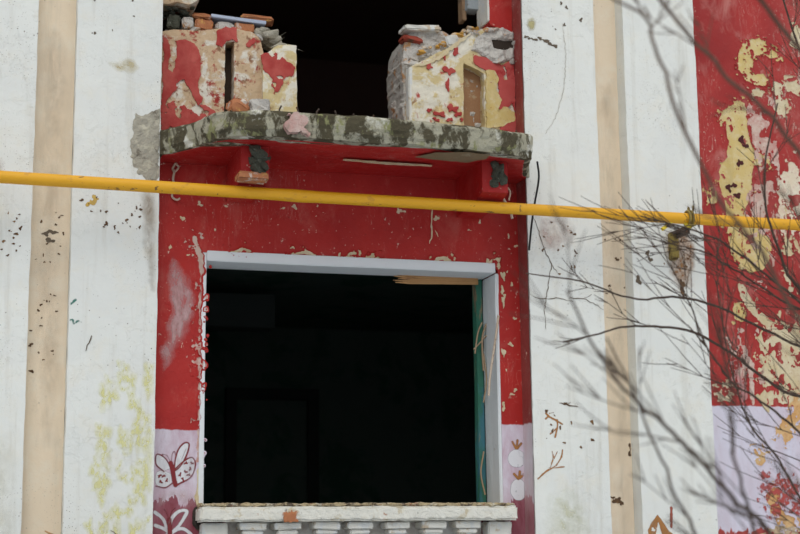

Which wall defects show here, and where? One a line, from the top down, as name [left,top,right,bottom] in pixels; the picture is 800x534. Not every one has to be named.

spalling [130,5,287,181]
flaking render [398,24,516,132]
peeling [701,21,800,219]
peeling [182,227,216,531]
crack [530,219,603,328]
peeling [713,226,800,468]
peeling [757,479,800,534]